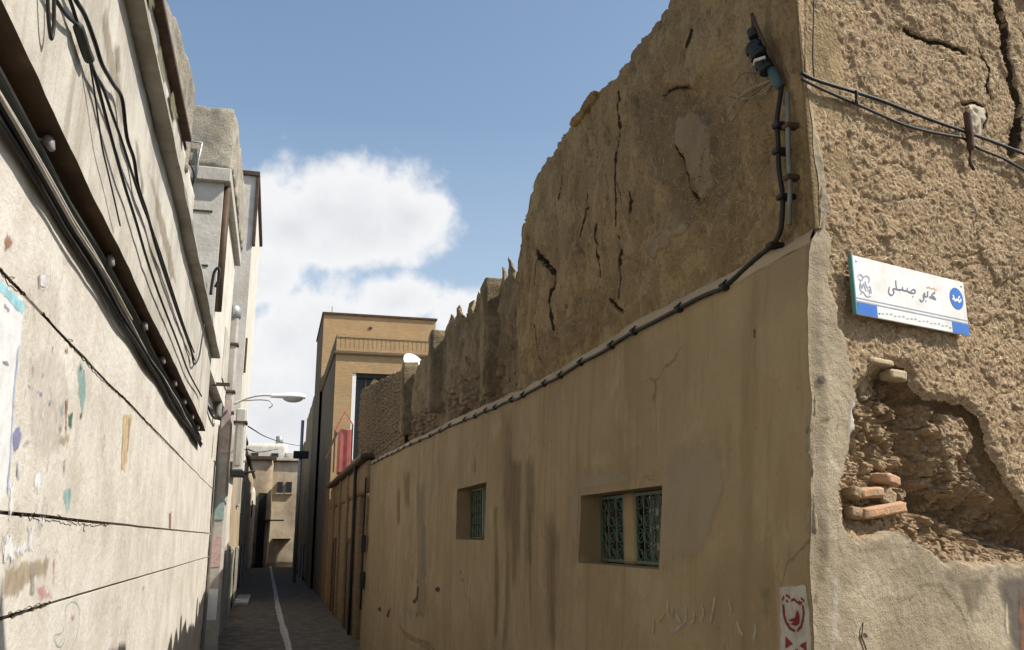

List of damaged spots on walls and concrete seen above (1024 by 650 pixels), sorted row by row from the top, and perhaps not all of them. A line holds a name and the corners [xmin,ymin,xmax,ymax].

crack [661,85,692,96]
crack [902,0,1024,156]
crack [580,91,633,311]
peeling [631,92,739,219]
crack [675,146,706,202]
crack [534,250,577,360]
spalling [838,357,1024,565]